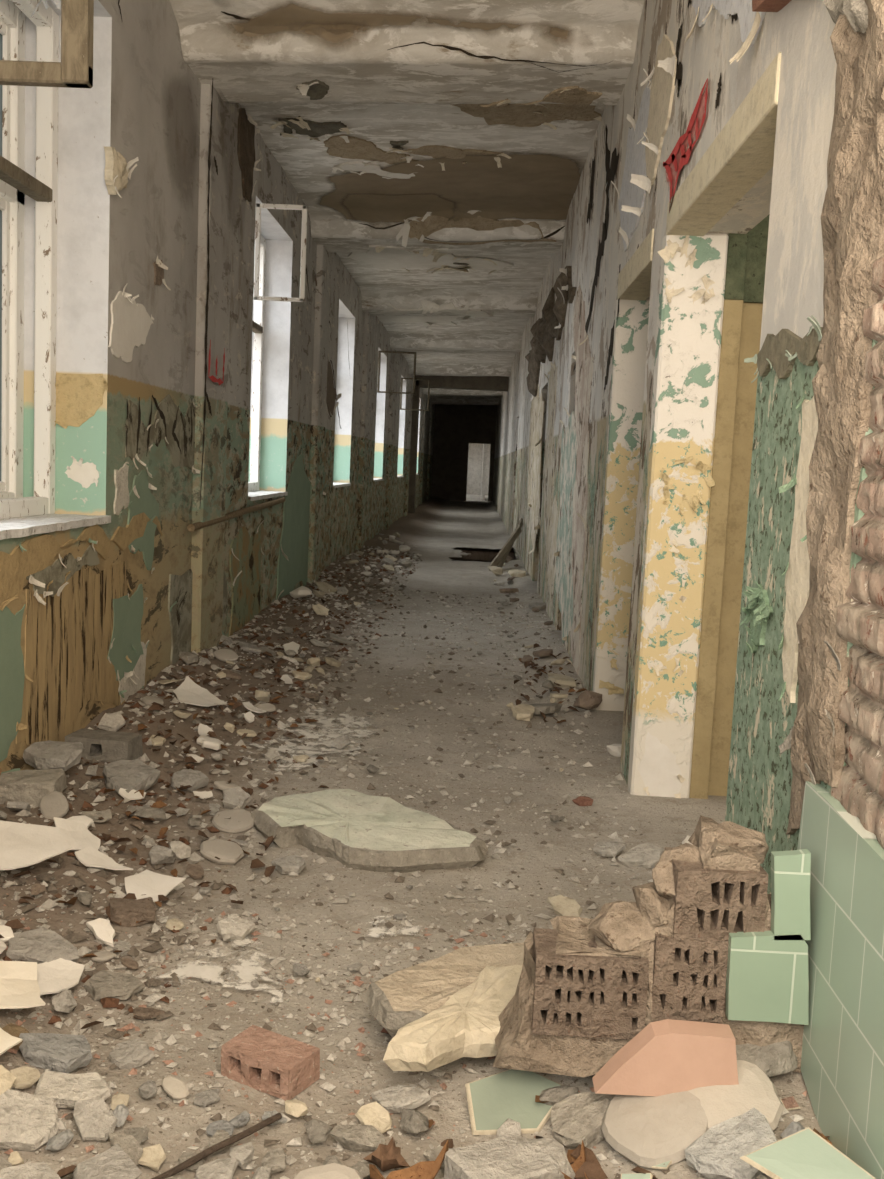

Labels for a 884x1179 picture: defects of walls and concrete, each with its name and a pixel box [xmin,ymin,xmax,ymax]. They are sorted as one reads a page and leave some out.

crack [388,42,612,73]
spalling [104,146,139,198]
spalling [237,108,511,202]
spalling [450,86,602,130]
peeling [611,0,791,251]
spalling [396,210,556,253]
peeling [108,283,154,363]
peeling [55,373,108,429]
spalling [326,360,342,417]
spalling [739,0,884,835]
peeling [276,454,326,600]
spalling [637,732,686,798]